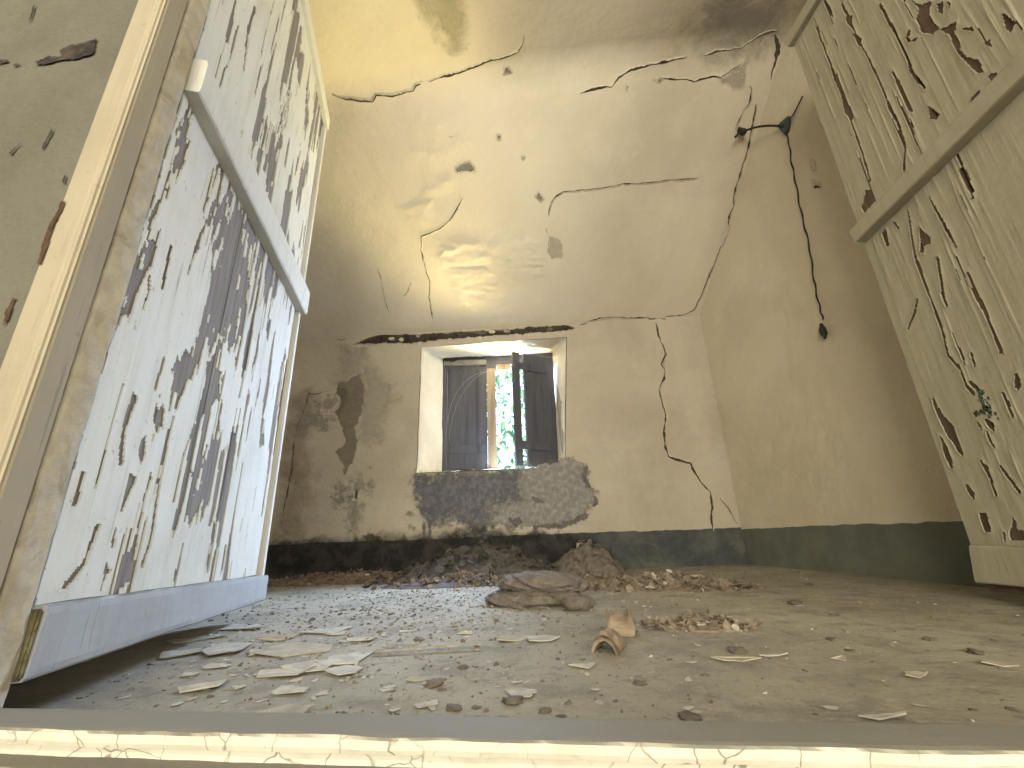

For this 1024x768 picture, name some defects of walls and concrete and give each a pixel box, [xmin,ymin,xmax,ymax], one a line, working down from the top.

flaking render [36,39,97,65]
peeling [194,0,321,270]
crack [332,35,524,102]
leakage [419,0,463,47]
peeling [794,0,1024,222]
peeling [33,92,295,605]
crack [377,199,464,321]
crack [546,178,698,248]
crack [580,28,778,531]
peeling [864,90,1024,546]
flaking render [414,458,599,531]